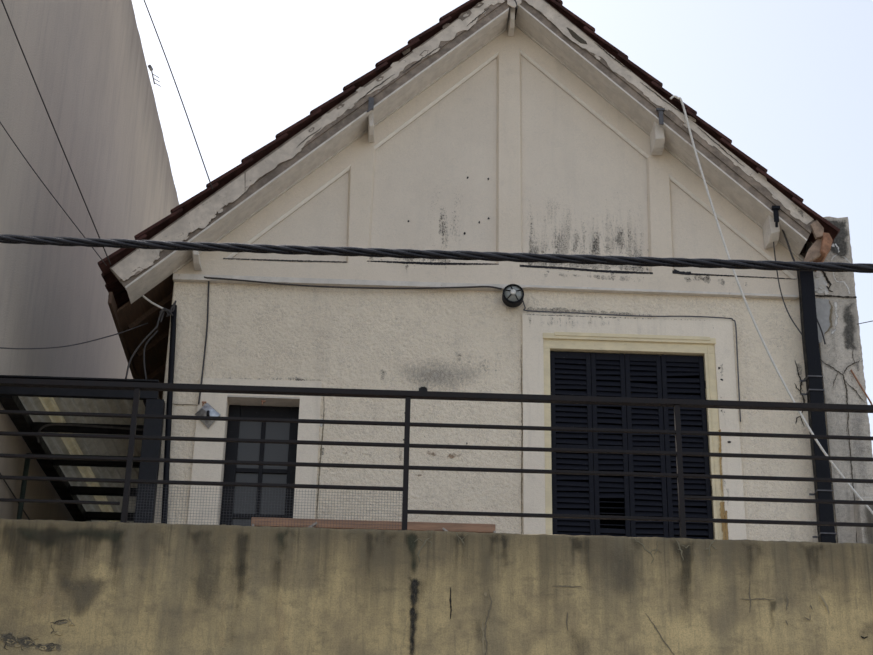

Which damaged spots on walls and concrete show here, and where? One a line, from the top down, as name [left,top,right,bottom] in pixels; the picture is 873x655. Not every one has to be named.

peeling [111,0,504,281]
peeling [524,0,814,225]
damp [520,223,653,280]
crack [815,292,857,300]
damp [7,528,120,554]
damp [238,535,247,575]
damp [407,534,418,655]
spalling [0,618,75,652]